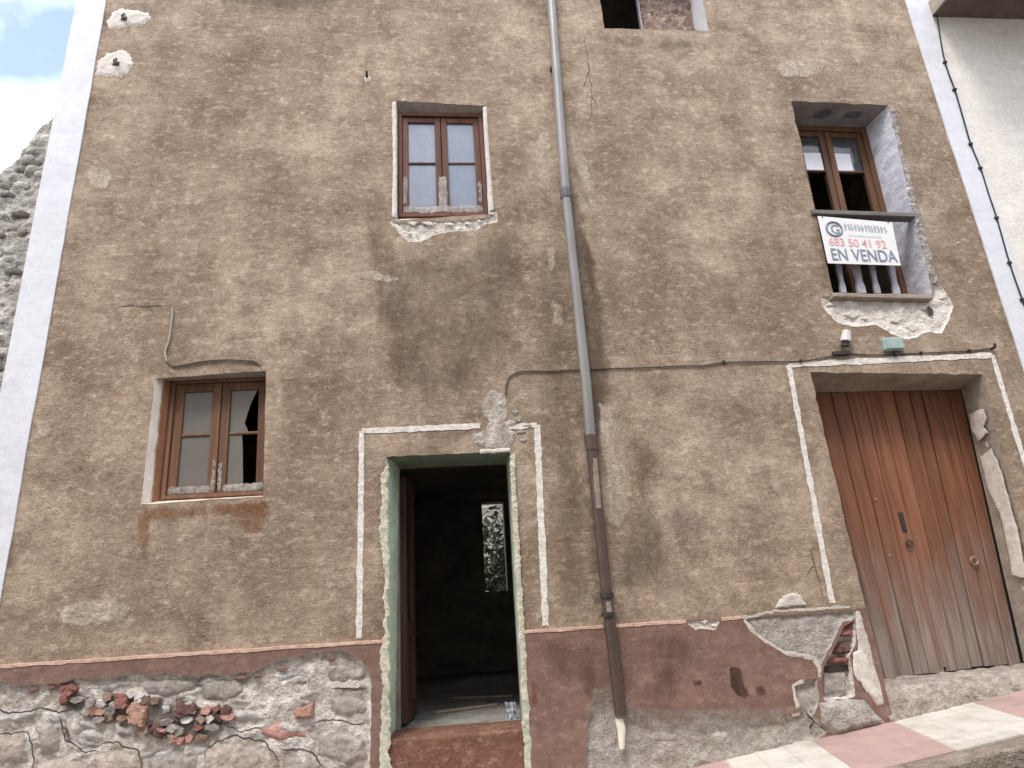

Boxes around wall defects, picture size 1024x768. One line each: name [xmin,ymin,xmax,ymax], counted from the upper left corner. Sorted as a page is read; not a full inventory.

crack [583,32,597,121]
peeling [388,102,498,243]
peeling [819,105,953,339]
flaking render [0,461,392,768]
corrosion [139,502,269,544]
peeling [480,410,532,768]
flaking render [586,605,884,768]
leakage [730,667,748,696]
peeling [969,409,1024,590]